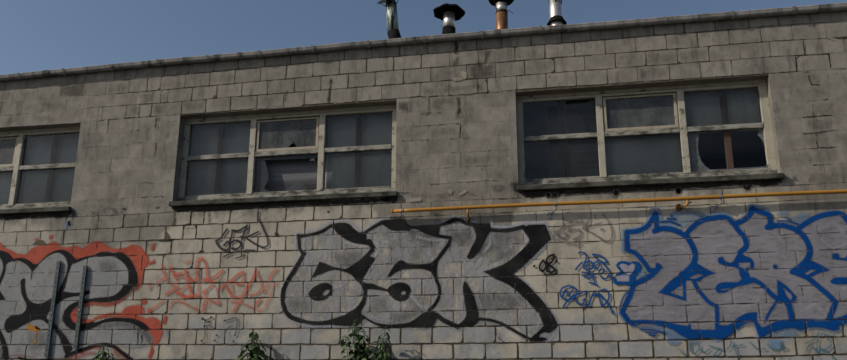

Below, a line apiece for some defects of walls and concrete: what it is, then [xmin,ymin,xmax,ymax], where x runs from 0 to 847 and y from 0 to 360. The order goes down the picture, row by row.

crack [766,37,847,182]